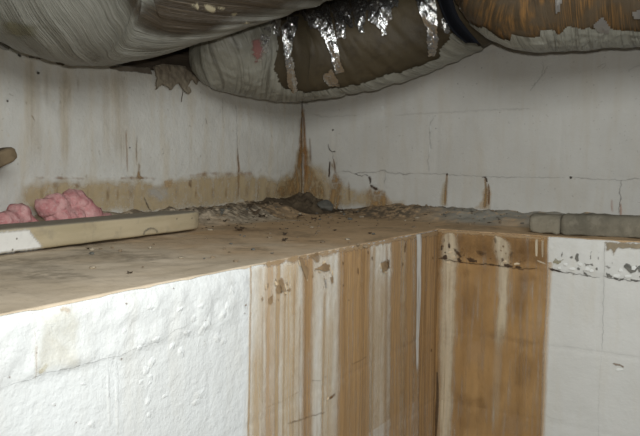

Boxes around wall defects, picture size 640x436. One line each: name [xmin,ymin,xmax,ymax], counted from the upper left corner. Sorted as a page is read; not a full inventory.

corrosion [279,113,386,209]
water stain [80,175,297,211]
spalling [432,244,521,268]
peeling [550,254,598,276]
peeling [606,263,640,282]
water stain [266,229,550,436]